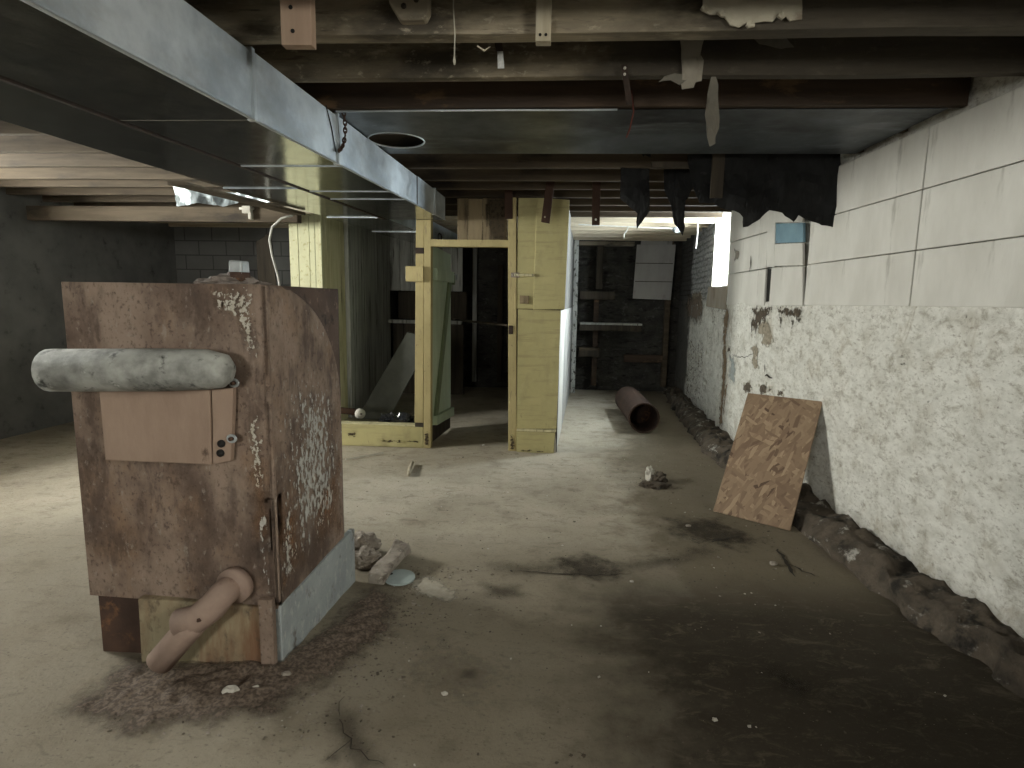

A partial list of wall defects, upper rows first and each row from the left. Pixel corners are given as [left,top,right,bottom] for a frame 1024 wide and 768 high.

flaking render [700,0,802,28]
flaking render [743,319,785,397]
damp [678,520,749,547]
damp [560,554,618,578]